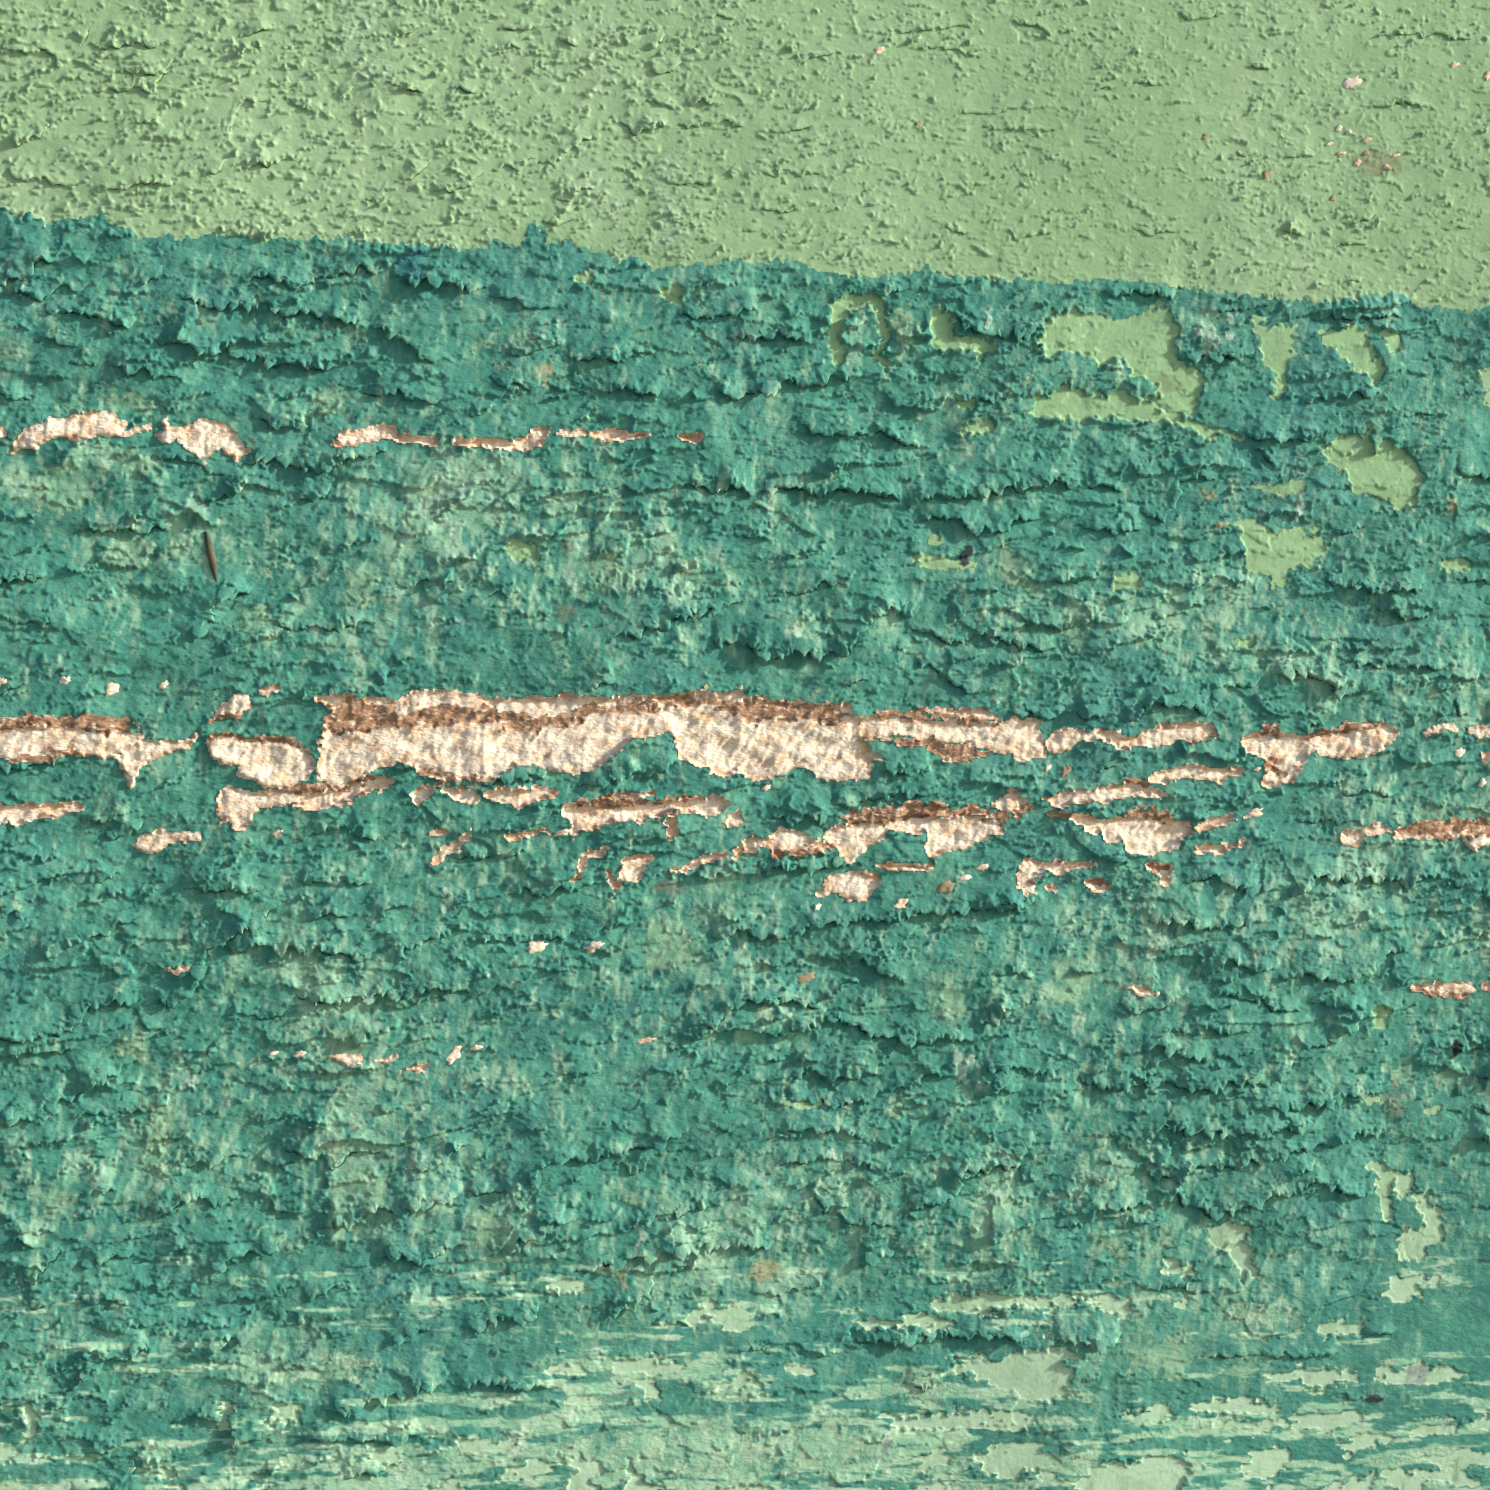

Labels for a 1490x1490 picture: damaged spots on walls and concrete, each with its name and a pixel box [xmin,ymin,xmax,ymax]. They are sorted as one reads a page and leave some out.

spalling [0,249,664,569]
peeling [715,283,1426,513]
peeling [711,575,1094,663]
peeling [156,879,514,1020]
spalling [0,654,1400,978]
peeling [1286,868,1490,902]
spalling [1296,698,1490,852]
peeling [0,1026,153,1130]
peeling [269,1027,717,1269]
peeling [425,942,1490,1490]
peeling [111,1439,184,1490]
peeling [202,1326,590,1480]